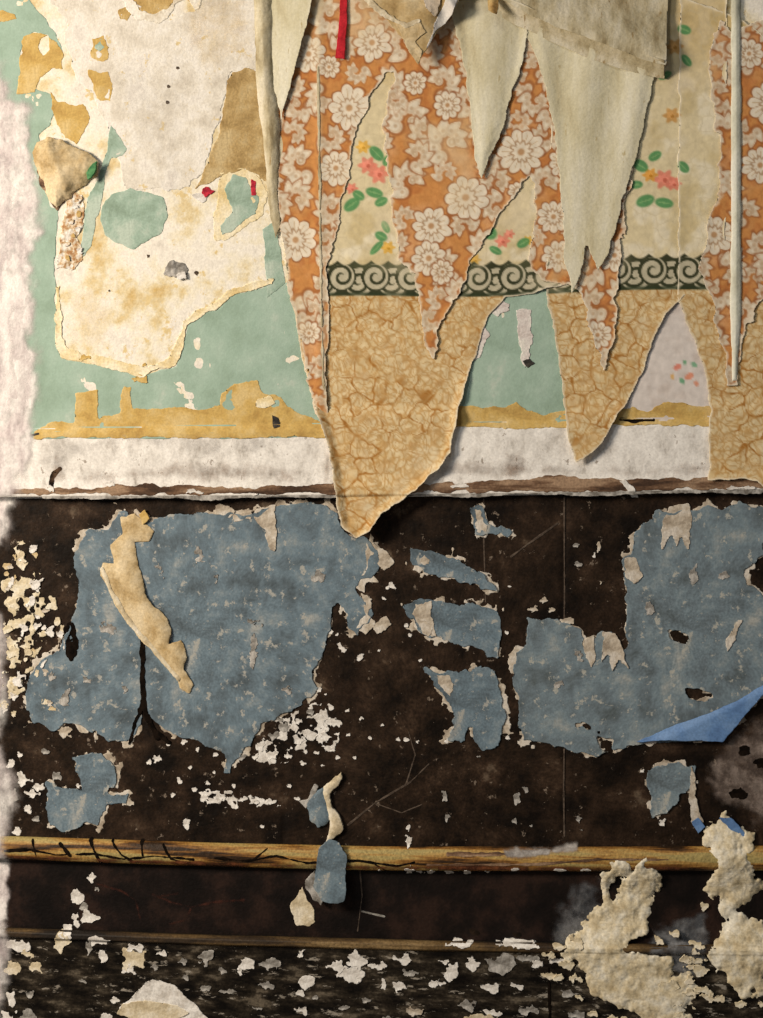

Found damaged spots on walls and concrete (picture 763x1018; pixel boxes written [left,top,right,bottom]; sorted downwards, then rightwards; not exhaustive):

peeling [16,0,266,203]
flaking render [612,302,712,427]
peeling [0,475,763,833]
damp [716,737,763,813]
peeling [286,772,347,905]
peeling [3,940,43,975]
peeling [54,889,101,954]
peeling [85,935,110,963]
peeling [100,943,281,1018]
peeling [294,975,318,1016]
peeling [326,949,419,993]
peeling [428,937,564,994]